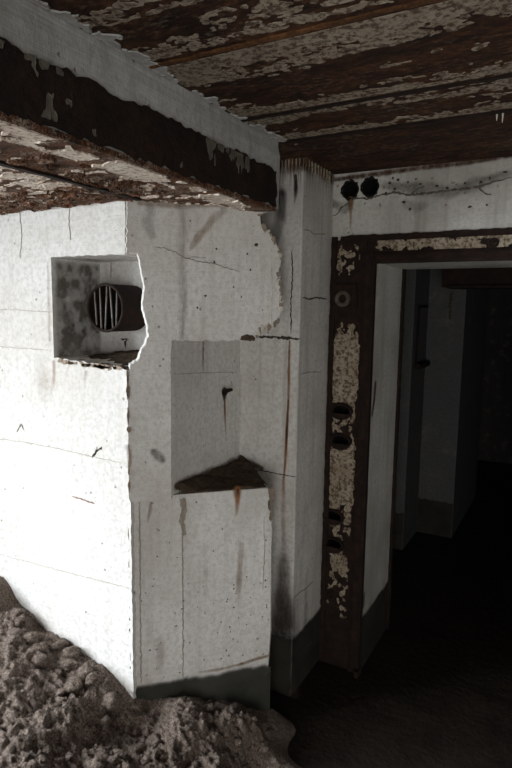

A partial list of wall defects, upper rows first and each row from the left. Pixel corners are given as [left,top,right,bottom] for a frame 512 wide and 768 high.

peeling [24,0,512,145]
leakage [57,263,100,357]
peeling [0,120,284,341]
crack [157,209,239,335]
crack [258,252,326,340]
peeling [336,244,360,275]
crack [333,177,511,216]
peeling [376,235,512,251]
peeling [329,322,360,541]
peeling [327,551,349,618]